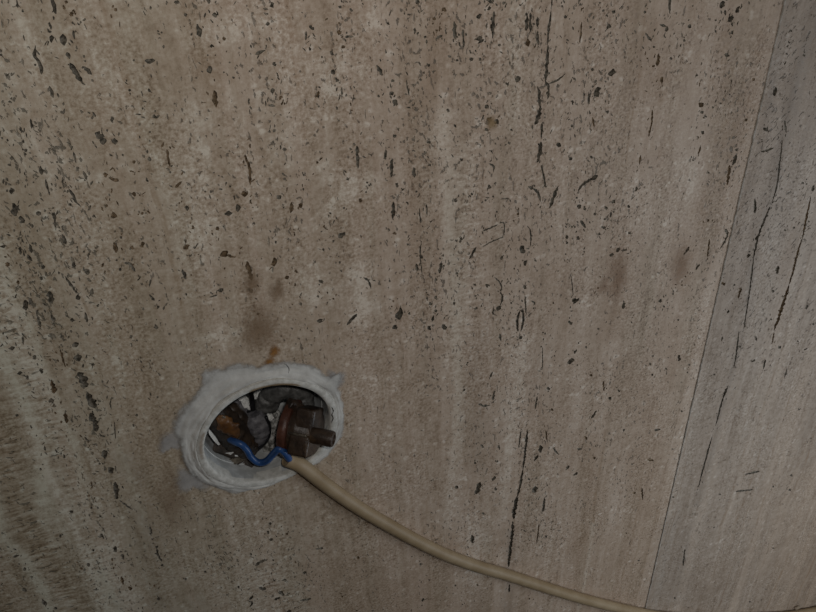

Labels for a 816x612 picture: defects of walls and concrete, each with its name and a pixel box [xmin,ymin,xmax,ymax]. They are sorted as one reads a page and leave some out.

crack [534,0,566,188]
crack [507,429,528,592]